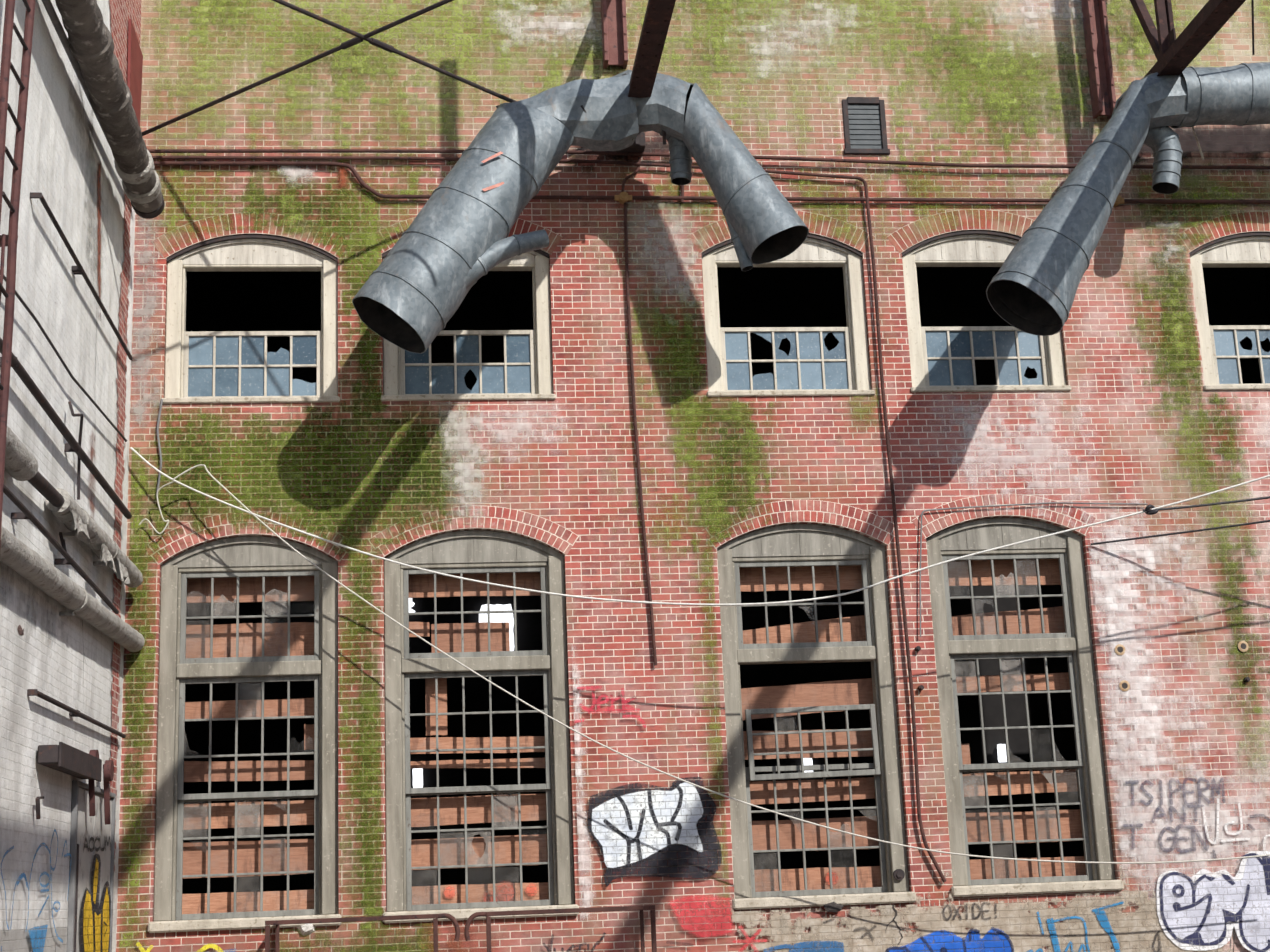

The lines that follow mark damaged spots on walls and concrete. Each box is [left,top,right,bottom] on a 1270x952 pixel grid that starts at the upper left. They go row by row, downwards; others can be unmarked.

water stain [1090,526,1270,884]